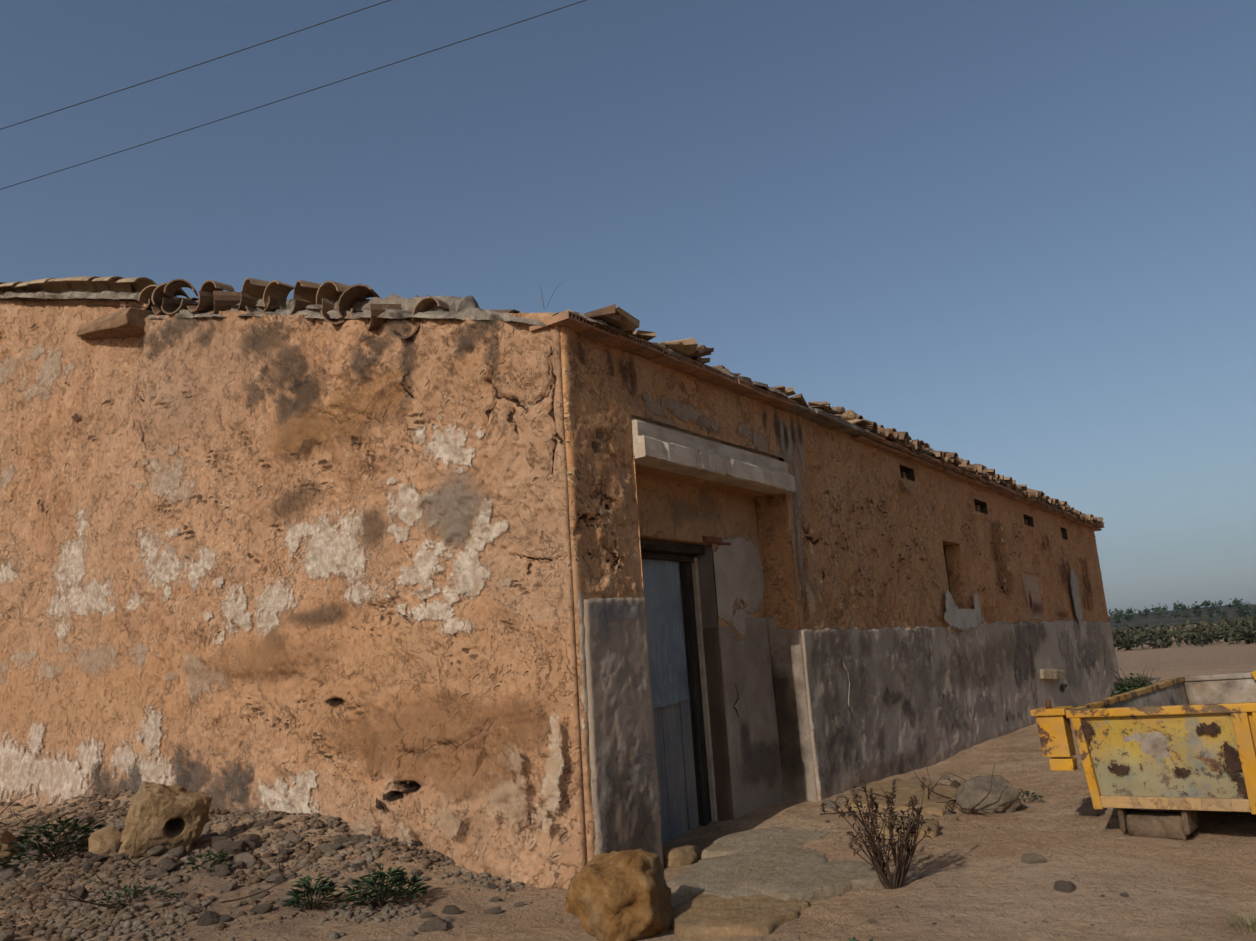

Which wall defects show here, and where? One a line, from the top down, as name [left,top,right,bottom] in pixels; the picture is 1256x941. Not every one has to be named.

crack [485,342,562,473]
peeling [0,444,522,684]
crack [510,477,624,575]